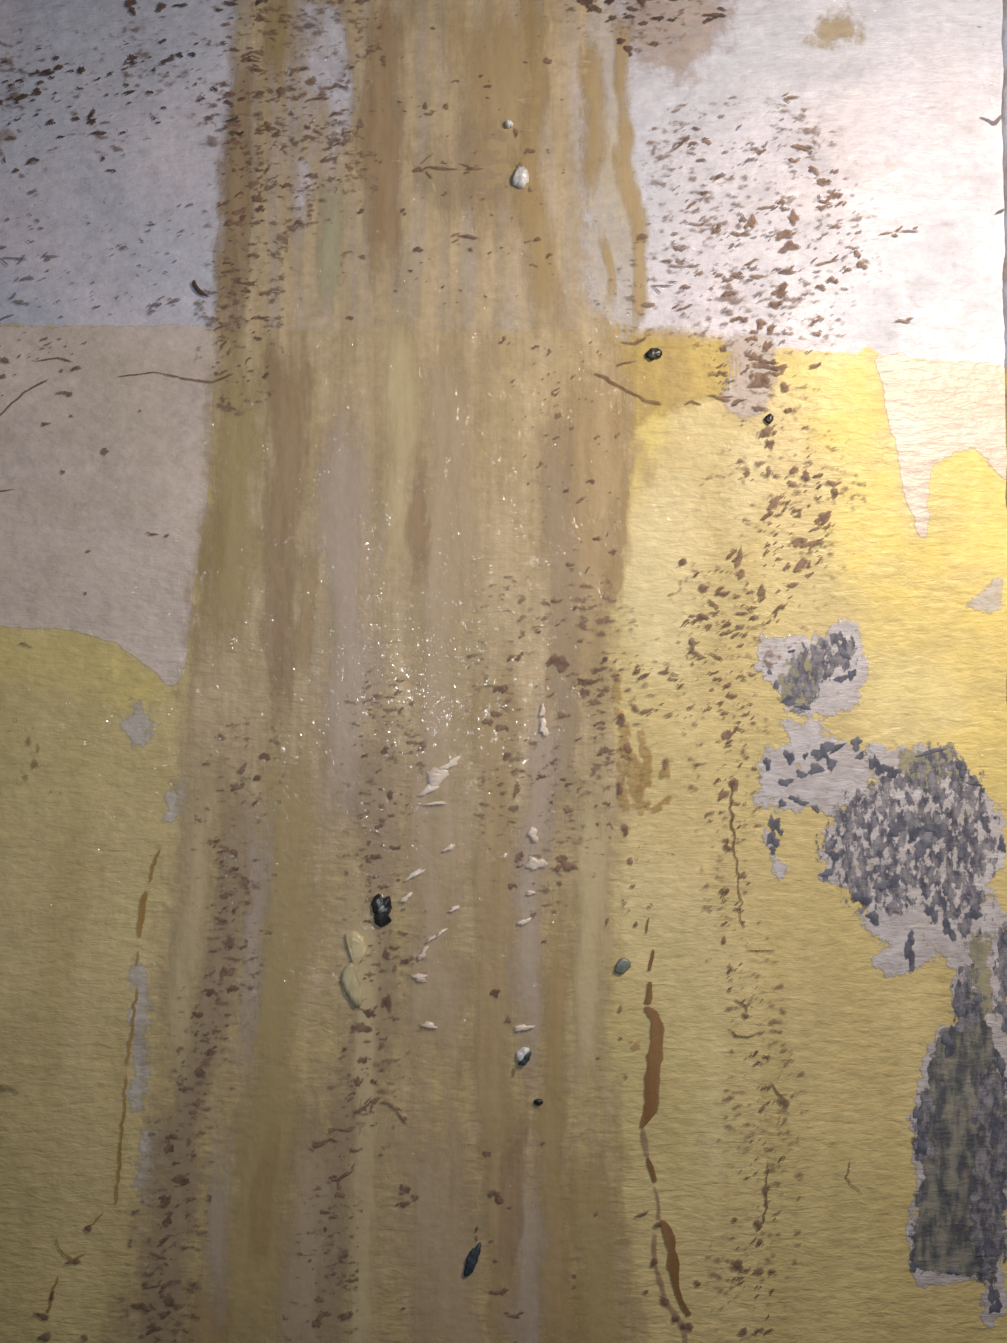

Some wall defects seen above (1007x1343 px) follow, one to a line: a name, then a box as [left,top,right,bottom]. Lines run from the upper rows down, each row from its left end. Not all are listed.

damp [0,27,210,155]
damp [0,213,112,323]
damp [0,332,87,379]
peeling [645,348,662,361]
peeling [722,334,774,424]
peeling [0,324,220,686]
peeling [875,352,1007,537]
damp [117,0,870,1343]
spalling [753,619,1007,1328]
rust [631,950,665,1128]
rust [647,1157,657,1182]
rust [634,1211,701,1331]